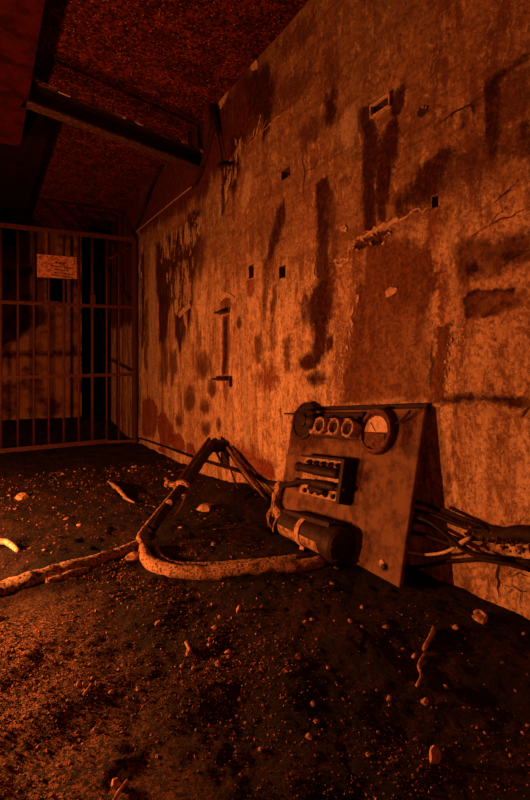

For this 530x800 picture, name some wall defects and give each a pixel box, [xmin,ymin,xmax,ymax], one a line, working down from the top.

crack [439,95,484,124]
leakage [105,14,530,408]
spalling [350,229,392,251]
crack [468,185,529,240]